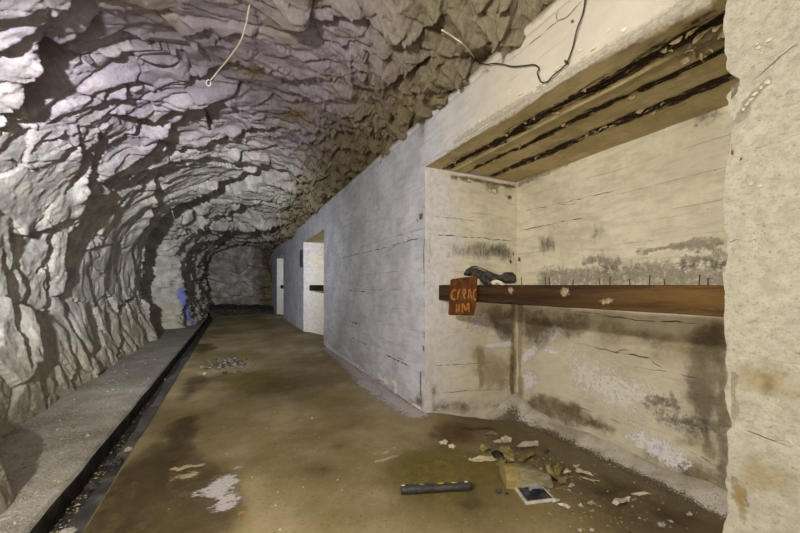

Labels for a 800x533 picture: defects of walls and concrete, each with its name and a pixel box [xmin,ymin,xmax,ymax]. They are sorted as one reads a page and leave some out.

peeling [677,24,725,65]
peeling [436,0,710,156]
damp [468,244,509,257]
crack [578,343,707,381]
damp [467,309,745,514]